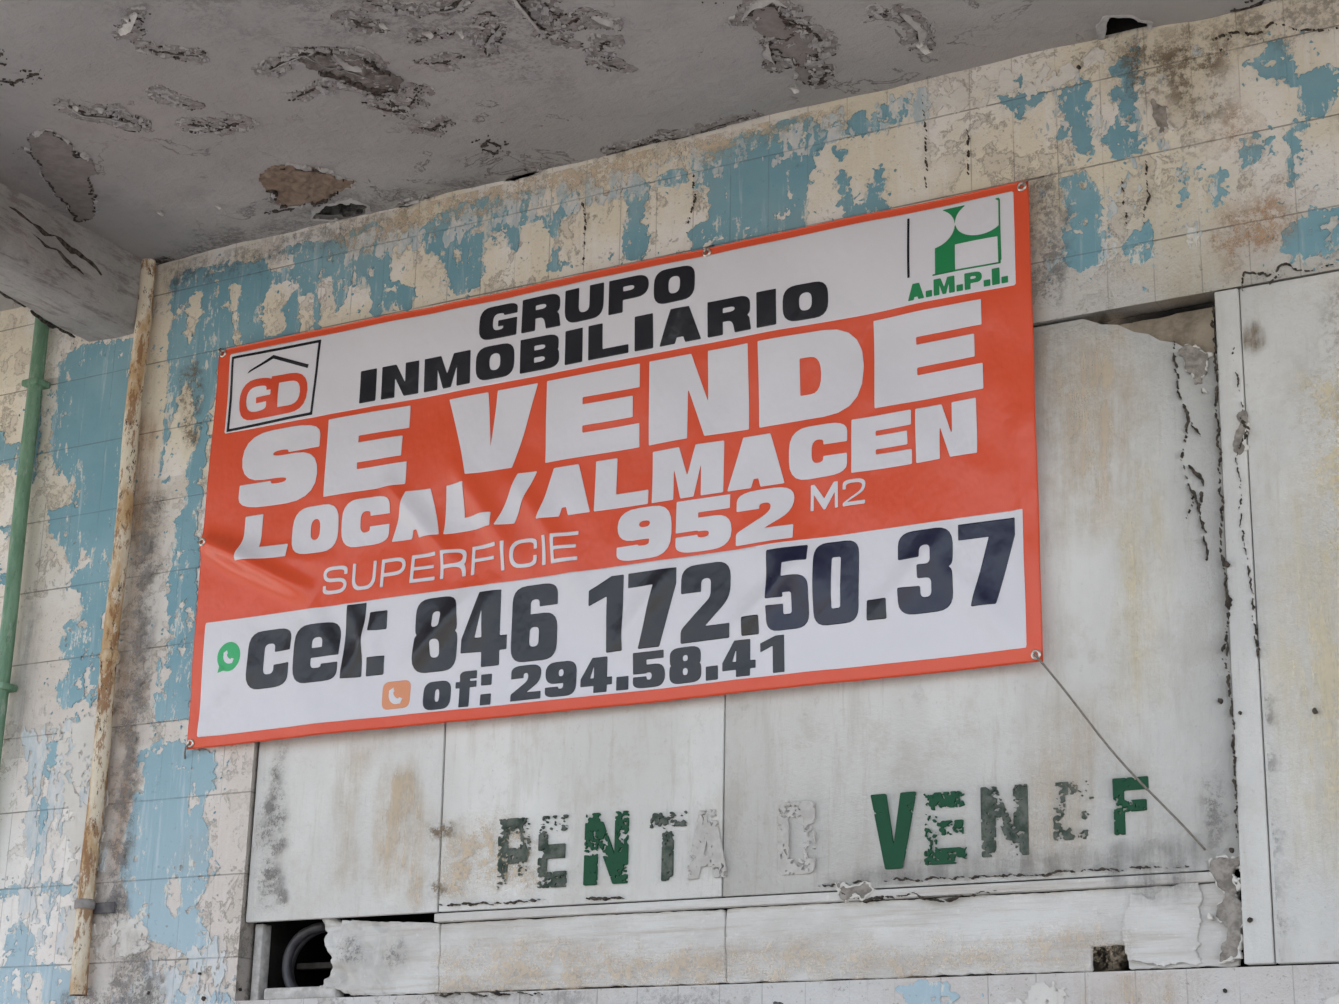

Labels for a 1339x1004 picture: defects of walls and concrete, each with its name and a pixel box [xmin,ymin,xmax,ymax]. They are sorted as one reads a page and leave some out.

flaking render [292,47,404,94]
flaking render [743,4,822,94]
spalling [913,42,931,55]
flaking render [23,129,100,223]
peeling [996,15,1339,283]
peeling [90,86,932,1004]
crack [1172,262,1334,838]
peeling [0,338,133,1004]
peeling [895,979,960,1004]
peeling [999,980,1068,1004]